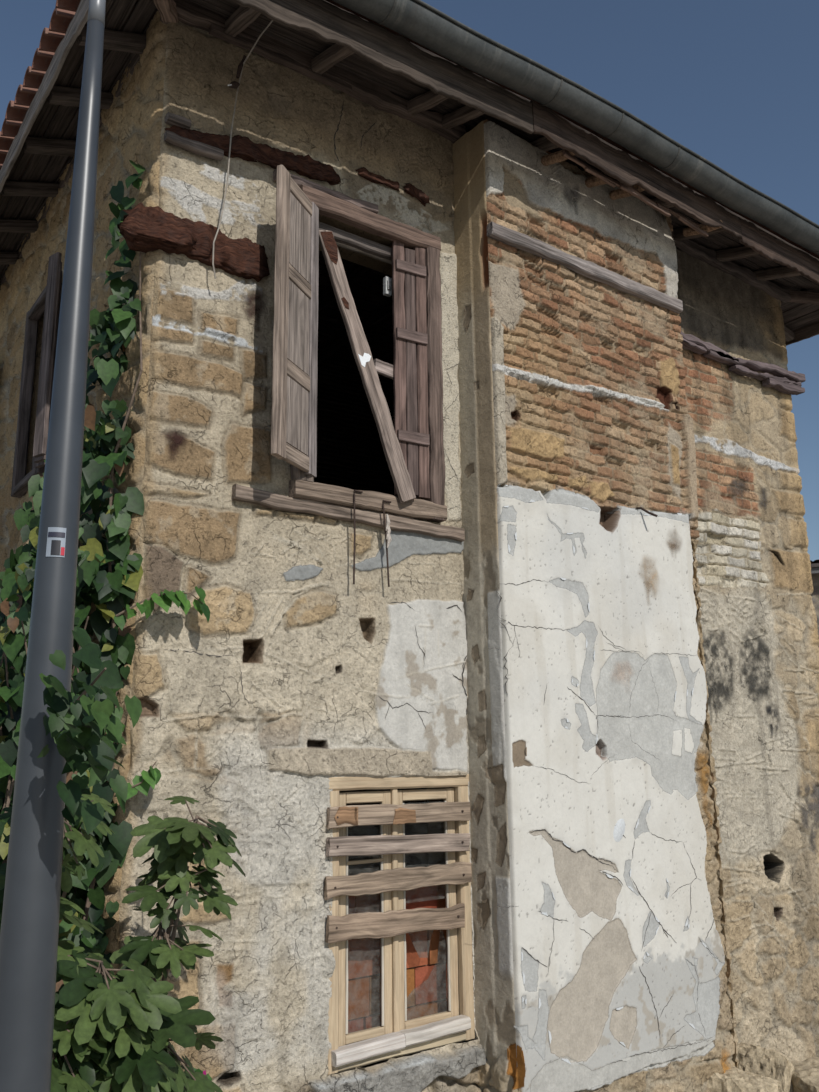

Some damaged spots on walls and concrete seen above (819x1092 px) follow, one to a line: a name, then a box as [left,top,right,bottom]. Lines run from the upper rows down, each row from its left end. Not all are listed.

crack [381,698,431,728]
crack [536,629,696,784]
flaking render [549,577,704,800]
mould [703,634,778,727]
flaking render [634,801,651,839]
crack [497,905,594,971]
flaking render [507,829,725,1092]
crack [528,829,720,1063]